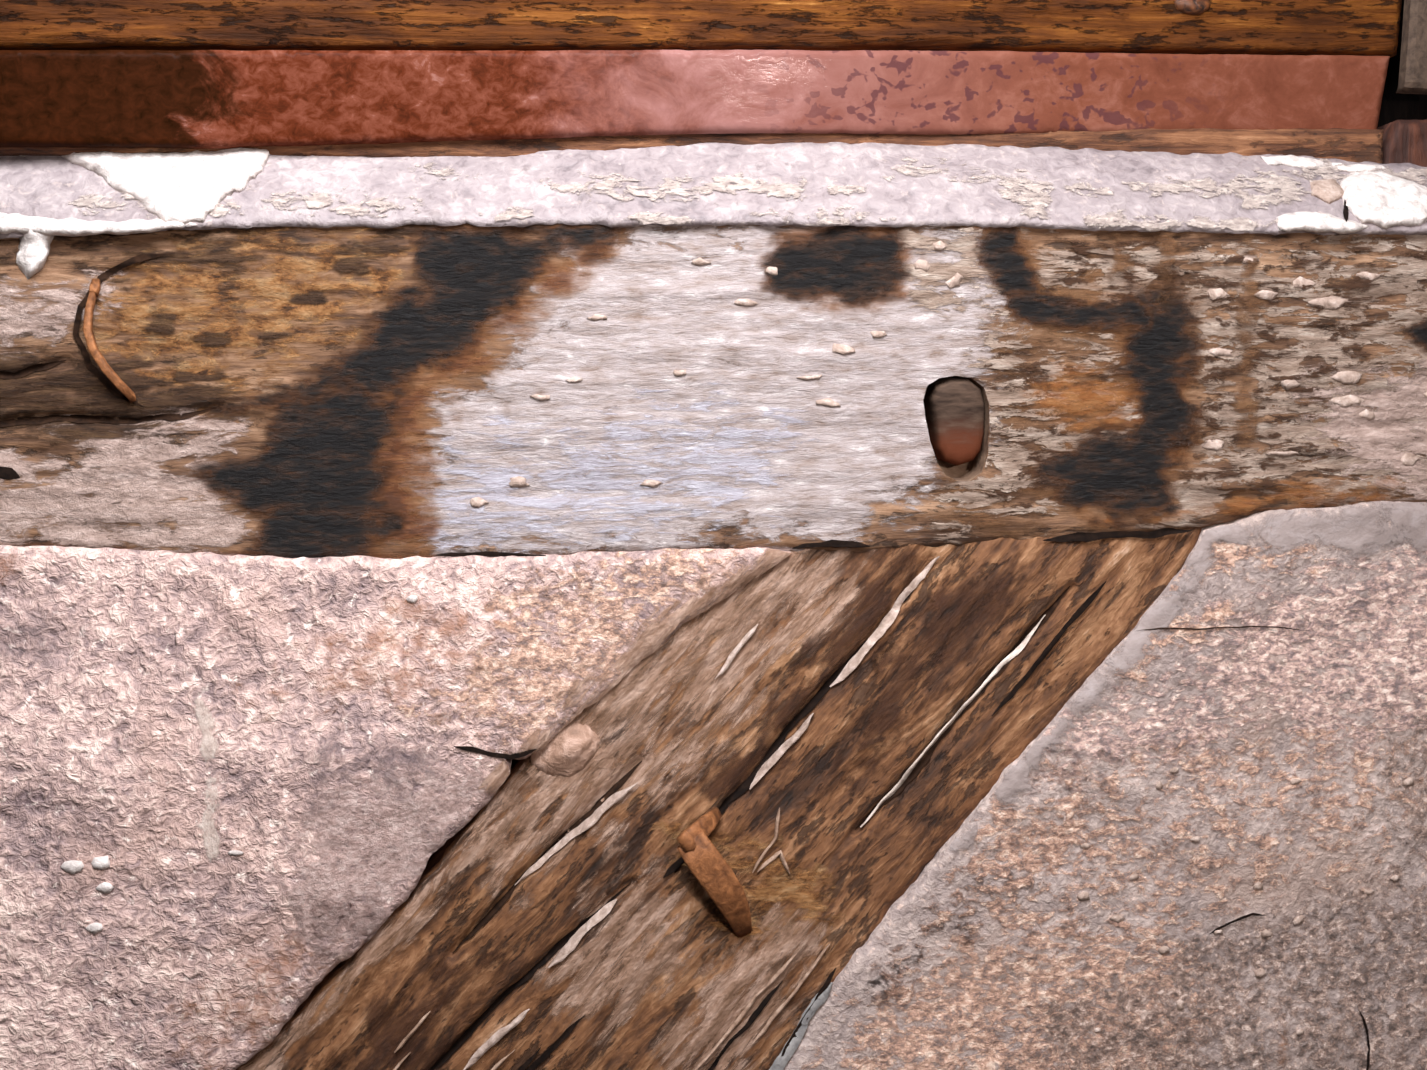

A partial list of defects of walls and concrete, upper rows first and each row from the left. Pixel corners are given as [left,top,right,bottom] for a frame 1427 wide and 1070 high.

corrosion [87,227,417,398]
damp [125,230,421,264]
damp [1038,231,1188,313]
damp [1234,233,1263,449]
damp [408,224,1142,800]
crack [715,556,940,815]
crack [854,581,1107,830]
damp [316,937,507,1070]
crack [393,857,684,1070]
crack [453,761,642,953]
crack [695,941,836,1070]
corrosion [707,832,840,948]